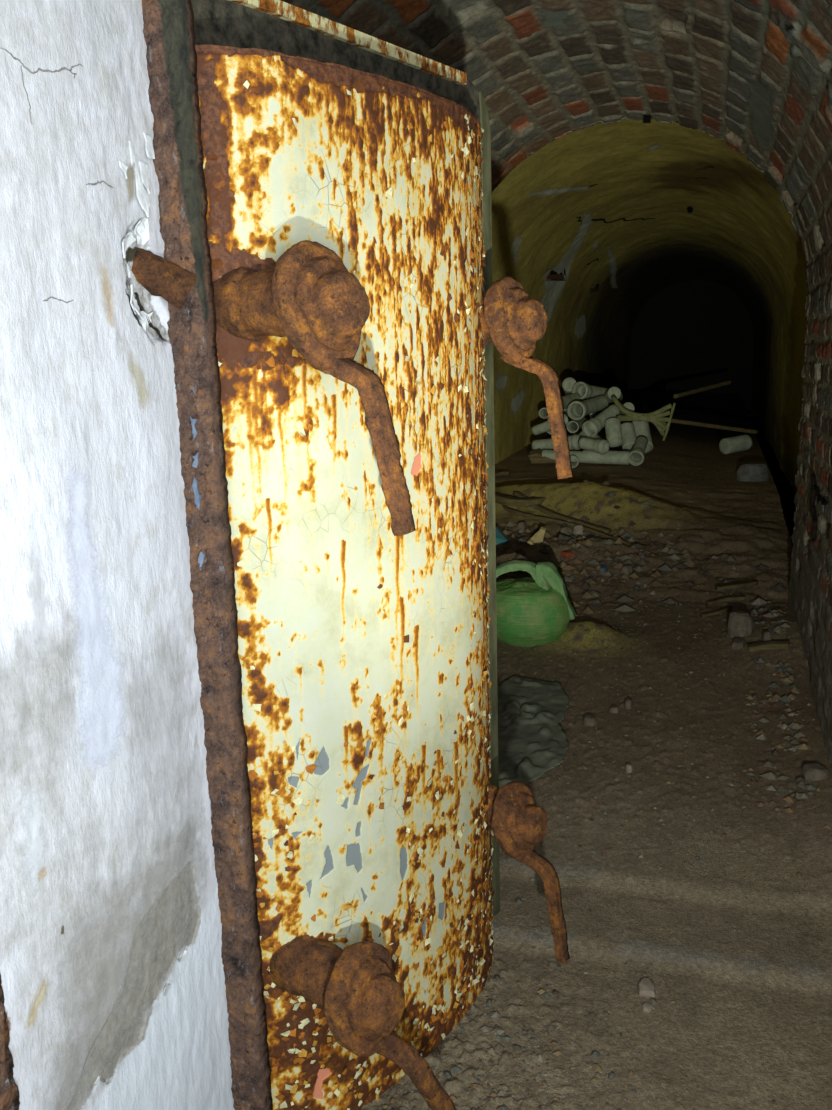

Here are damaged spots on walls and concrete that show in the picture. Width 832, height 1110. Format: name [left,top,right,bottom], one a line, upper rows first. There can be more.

crack [2,48,83,125]
peeling [346,79,365,95]
flaking render [119,132,169,342]
crack [576,216,655,224]
peeling [367,108,495,1056]
peeling [253,789,319,872]
peeling [256,889,282,925]
corrosion [29,984,46,1024]
peeling [58,861,201,1110]
peeling [264,967,394,1110]